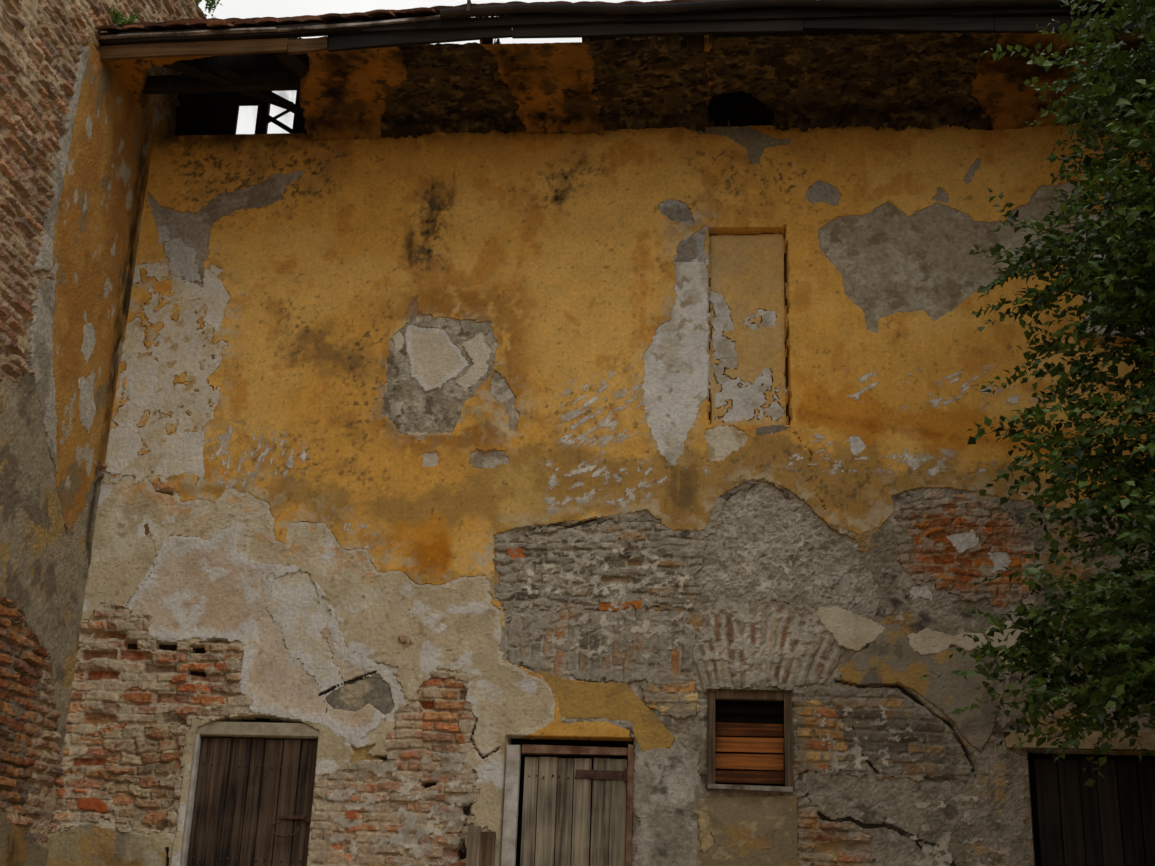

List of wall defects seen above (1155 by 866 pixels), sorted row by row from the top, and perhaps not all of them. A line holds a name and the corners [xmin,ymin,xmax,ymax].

spalling [380,39,526,139]
spalling [584,32,1002,164]
spalling [1064,31,1151,125]
peeling [25,42,176,532]
peeling [147,170,304,287]
peeling [805,180,1085,333]
peeling [493,199,791,558]
peeling [0,262,1155,866]
crack [318,671,377,696]
crack [835,681,974,774]